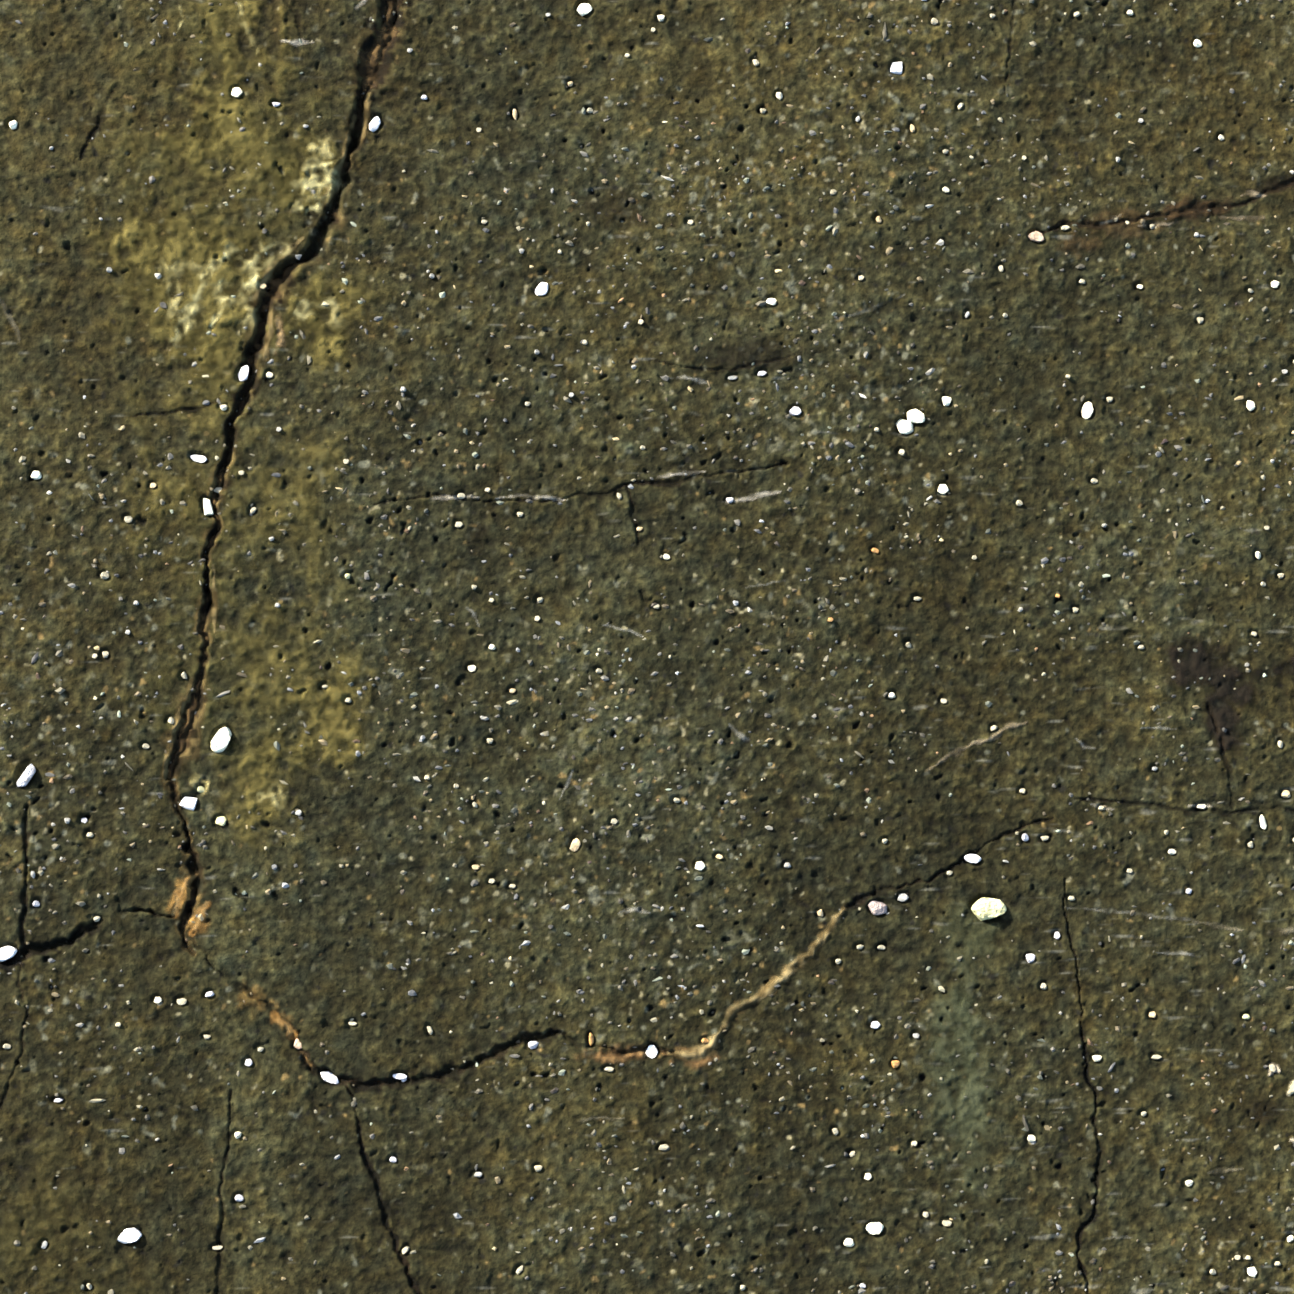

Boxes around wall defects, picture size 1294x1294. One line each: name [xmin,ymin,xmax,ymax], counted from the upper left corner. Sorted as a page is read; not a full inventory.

crack [80,126,100,160]
crack [133,0,404,956]
crack [427,493,564,502]
crack [618,471,705,505]
crack [732,463,786,502]
crack [972,724,1018,744]
crack [0,898,94,973]
crack [647,820,1045,1060]
crack [1063,880,1098,1136]
spalling [1268,1063,1294,1096]
crack [298,1029,564,1294]
crack [1076,1175,1099,1293]